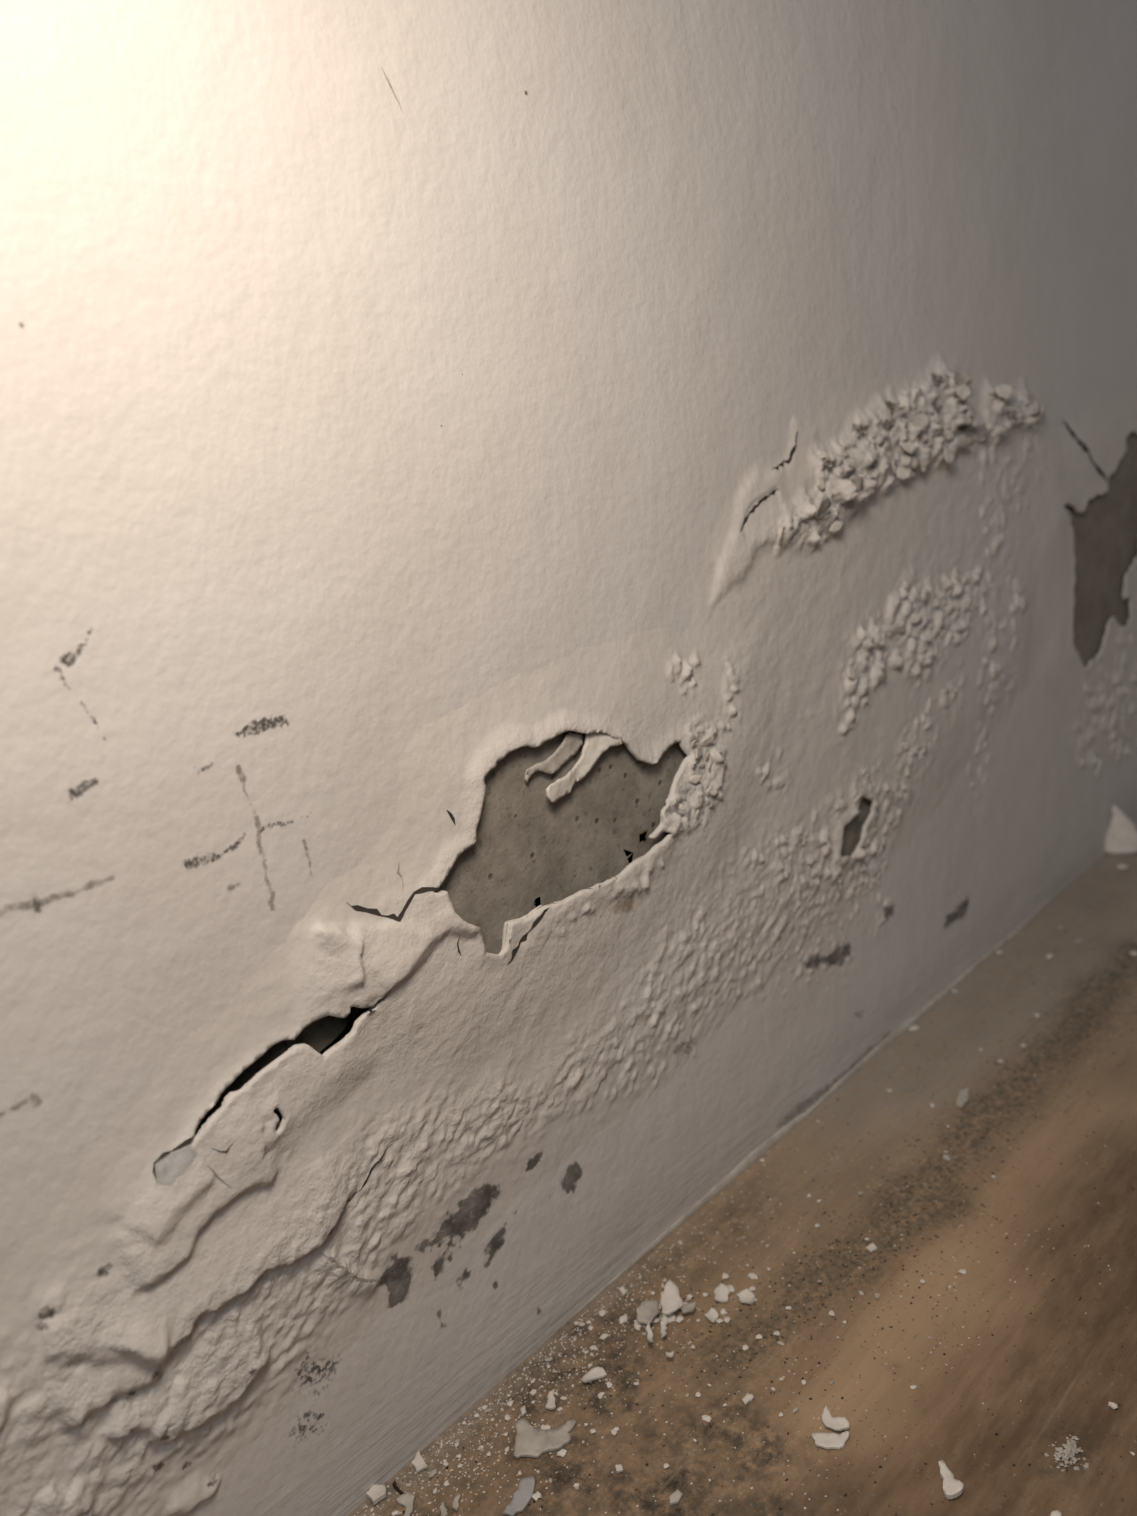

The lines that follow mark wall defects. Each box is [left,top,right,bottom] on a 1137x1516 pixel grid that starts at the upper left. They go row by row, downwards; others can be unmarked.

peeling [1031,392,1137,784]
crack [10,877,113,909]
crack [184,816,310,909]
peeling [62,609,809,1516]
crack [153,1136,279,1187]